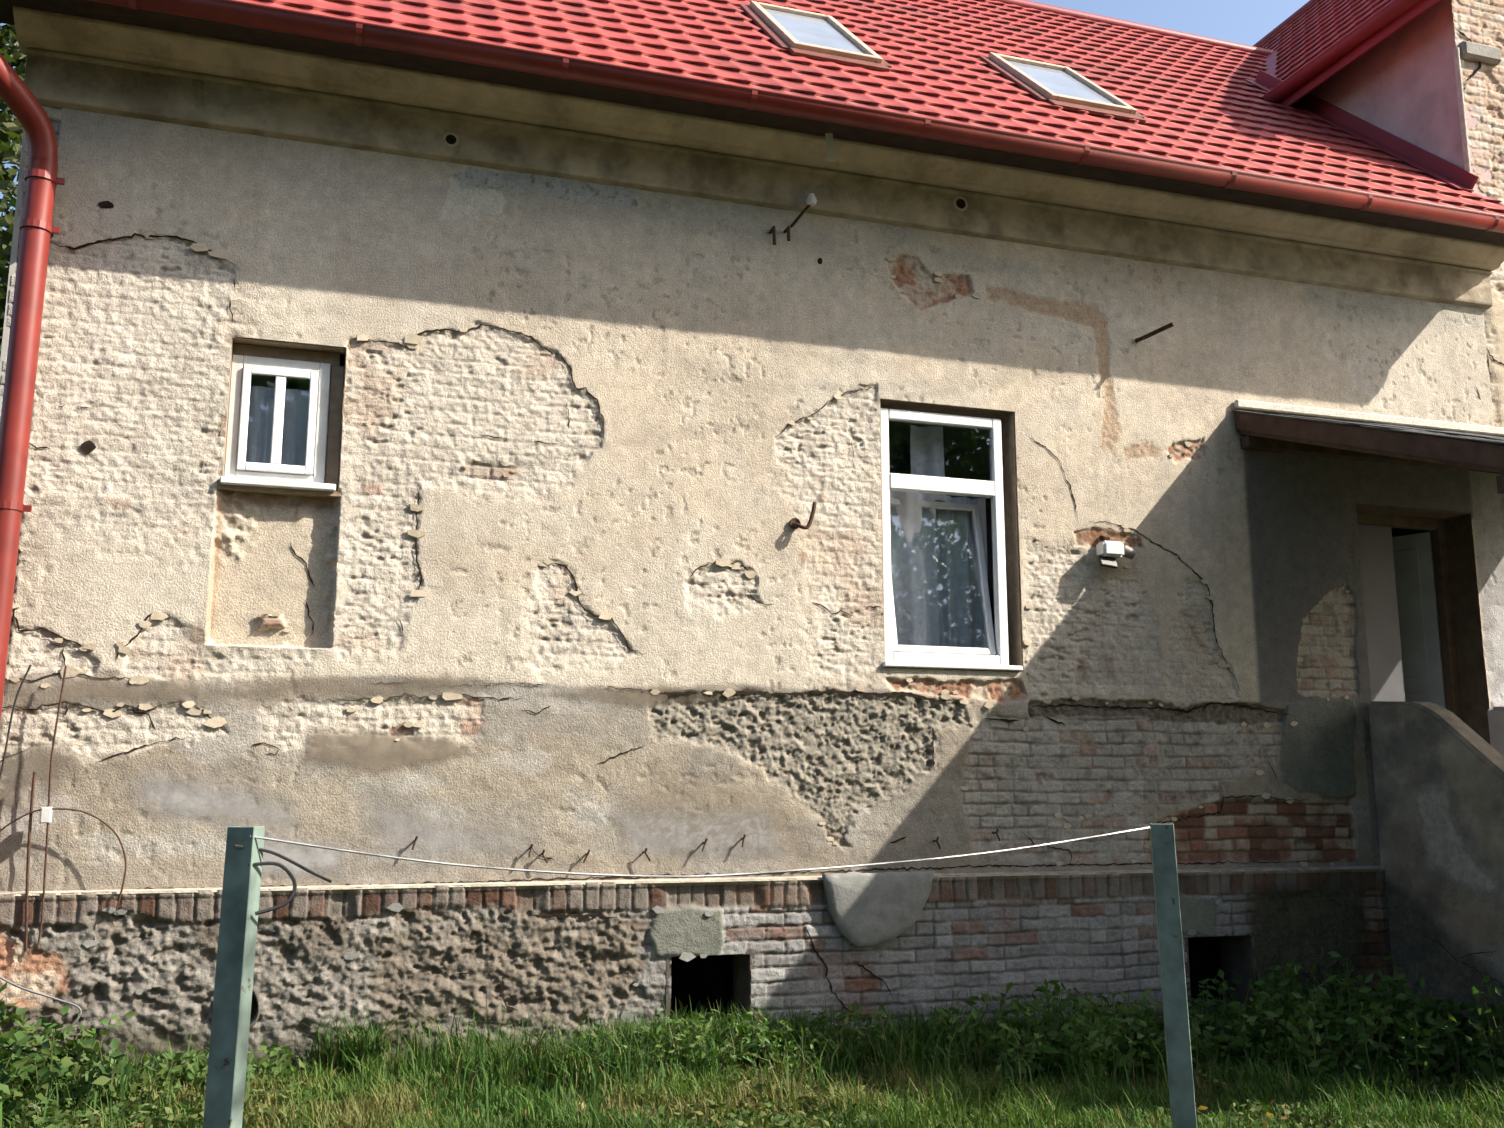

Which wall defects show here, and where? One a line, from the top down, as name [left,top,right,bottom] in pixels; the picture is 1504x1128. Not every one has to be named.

crack [50,233,236,322]
flaking render [16,232,254,581]
crack [353,324,604,444]
flaking render [0,320,604,765]
crack [414,488,422,590]
crack [0,597,280,762]
crack [338,681,552,714]
crack [541,438,1292,788]
flaking render [648,380,1360,867]
flaking render [0,932,69,1008]
flaking render [83,907,200,995]
flaking render [343,903,640,1037]